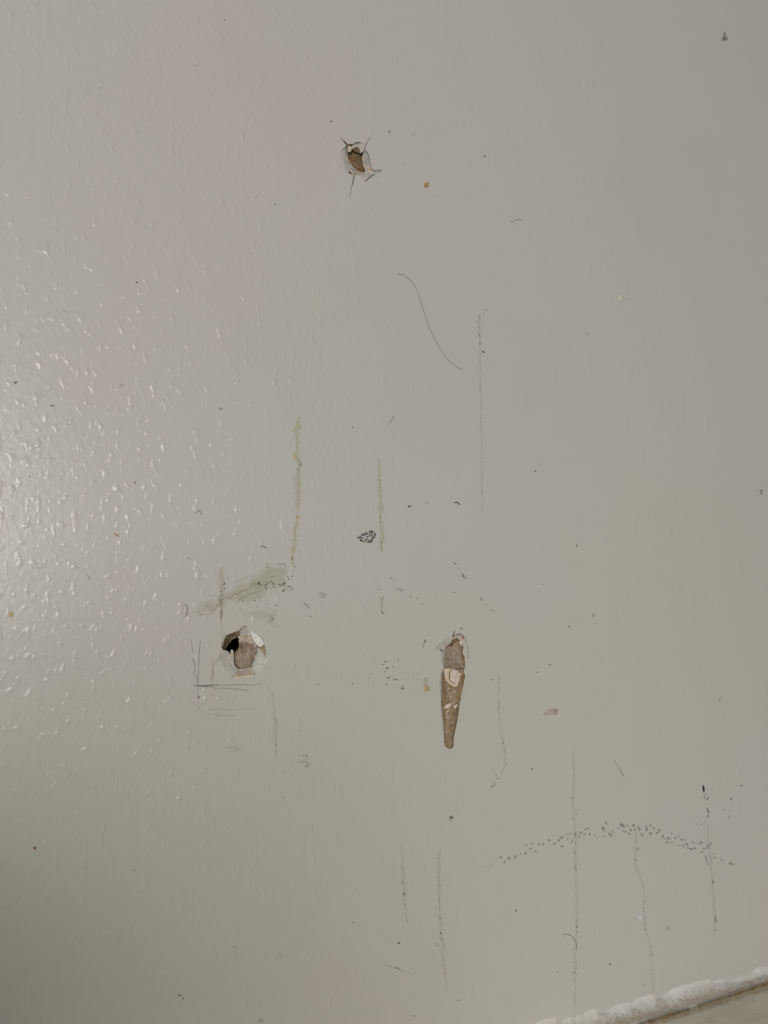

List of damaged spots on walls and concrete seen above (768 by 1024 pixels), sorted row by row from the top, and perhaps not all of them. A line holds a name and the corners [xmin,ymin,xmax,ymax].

peeling [248,628,264,647]
peeling [440,668,465,749]